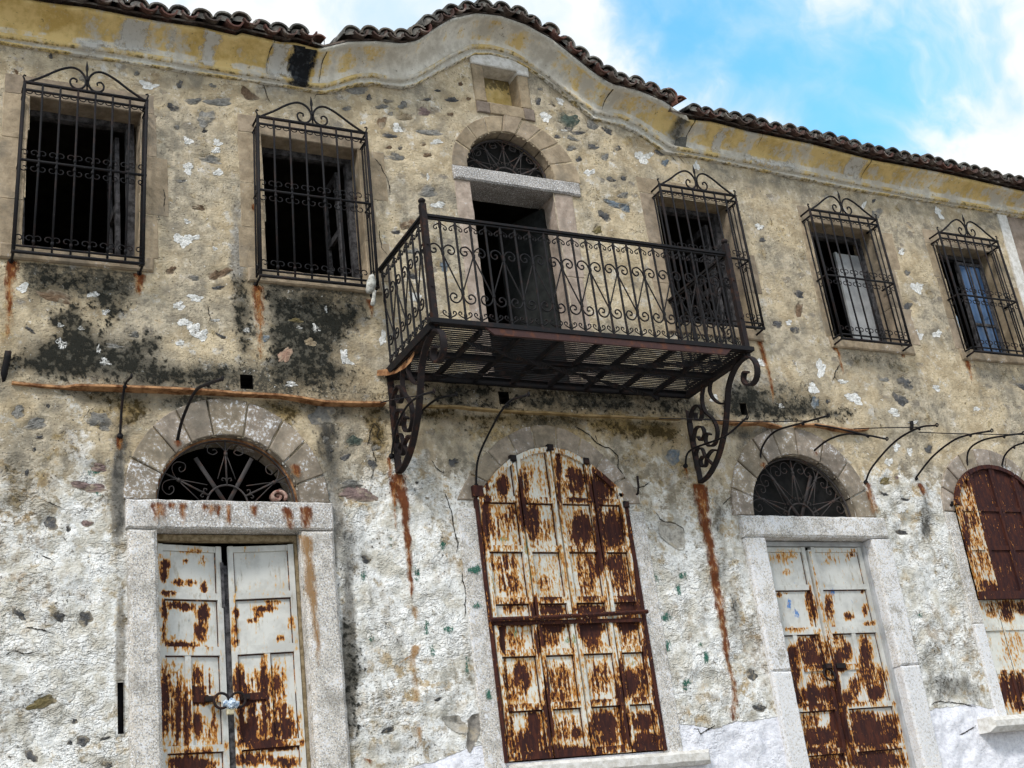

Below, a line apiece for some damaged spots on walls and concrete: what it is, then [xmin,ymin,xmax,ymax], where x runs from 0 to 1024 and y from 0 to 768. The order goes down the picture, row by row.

flaking render [134,71,159,90]
flaking render [342,81,471,160]
flaking render [674,137,687,147]
rust [4,261,19,333]
leakage [10,264,364,389]
leakage [722,380,854,441]
rust [151,502,187,517]
rust [203,504,231,522]
rust [387,457,417,618]
rust [282,506,320,650]
rust [684,468,738,721]
rust [400,645,419,696]